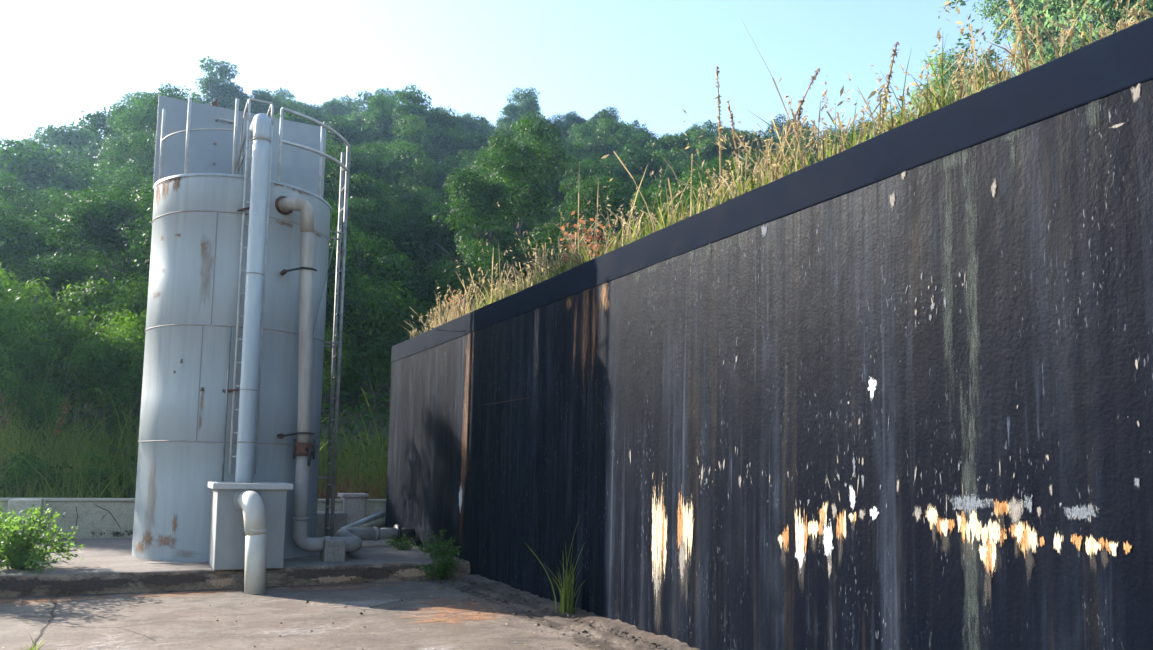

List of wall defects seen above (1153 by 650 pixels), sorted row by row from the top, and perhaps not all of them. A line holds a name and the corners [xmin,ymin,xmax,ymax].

rust [155,177,181,205]
rust [566,287,608,367]
rust [136,472,191,556]
rust [459,334,472,536]
peeling [651,474,693,616]
peeling [697,446,788,488]
peeling [778,452,887,581]
peeling [915,457,1132,598]